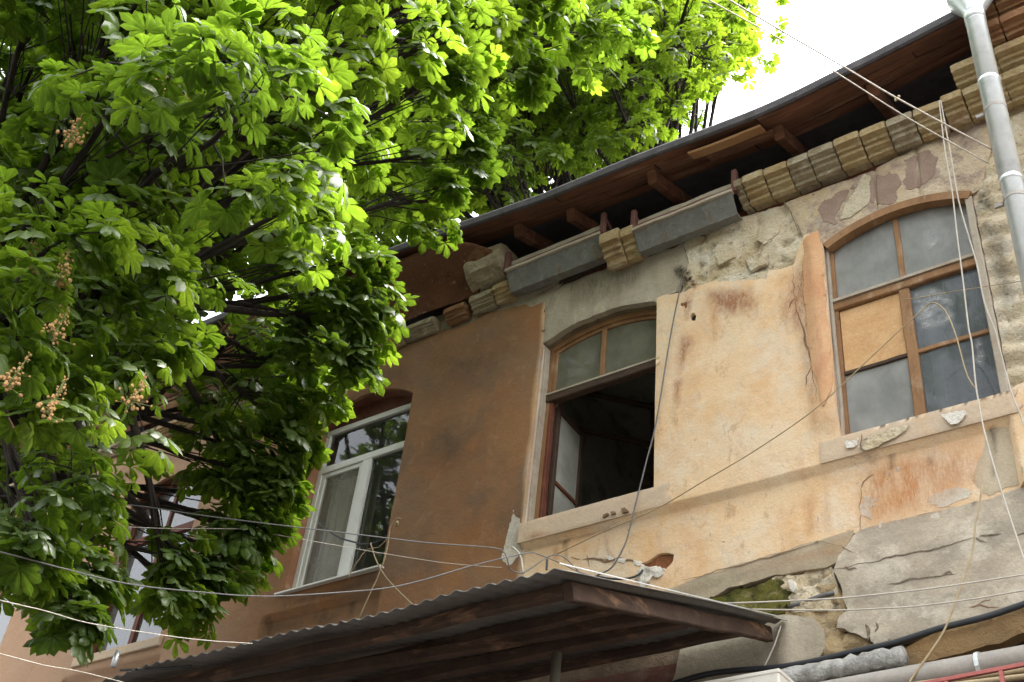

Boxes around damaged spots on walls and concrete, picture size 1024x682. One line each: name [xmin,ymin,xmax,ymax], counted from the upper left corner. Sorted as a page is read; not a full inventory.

flaking render [1009,108,1024,177]
flaking render [681,121,1024,386]
crack [789,275,817,390]
peeling [845,424,910,450]
peeling [928,427,1023,518]
flaking render [636,554,674,587]
flaking render [772,567,890,656]
crack [685,475,1024,584]